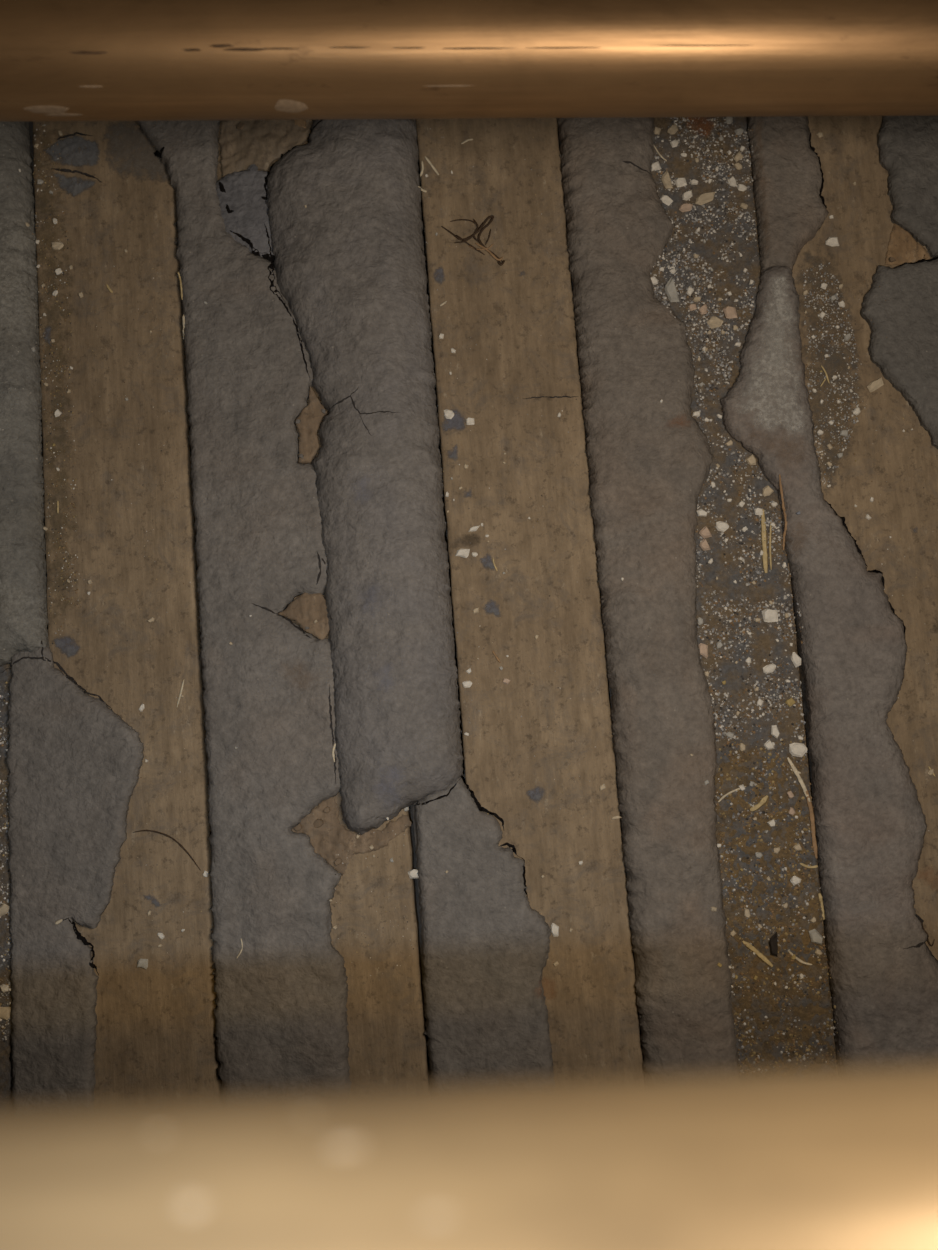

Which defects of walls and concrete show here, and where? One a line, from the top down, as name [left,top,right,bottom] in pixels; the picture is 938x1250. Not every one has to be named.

flaking render [660,171,715,212]
crack [219,119,323,378]
flaking render [826,237,839,247]
flaking render [707,306,738,329]
spalling [295,385,328,464]
flaking render [754,485,774,515]
flaking render [716,521,729,532]
spalling [277,592,330,640]
flaking render [762,609,778,622]
flaking render [791,652,801,667]
flaking render [764,725,807,757]
spalling [292,796,412,876]